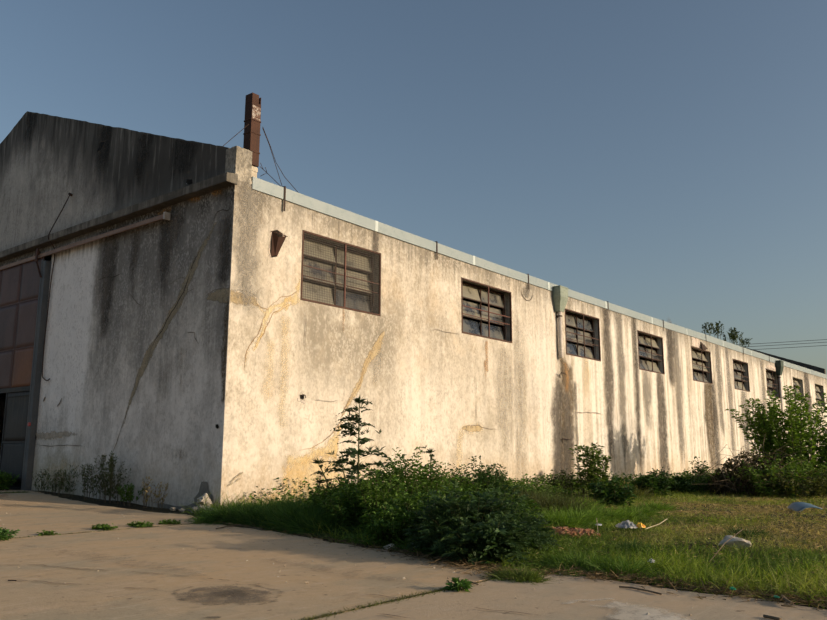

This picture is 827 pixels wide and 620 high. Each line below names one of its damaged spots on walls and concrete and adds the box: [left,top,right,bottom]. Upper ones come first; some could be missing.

leakage [173,140,195,175]
leakage [101,235,118,333]
crack [111,208,307,456]
leakage [221,301,229,401]
crack [288,332,385,465]
leakage [536,358,579,485]
leakage [603,308,685,477]
leakage [705,345,750,472]